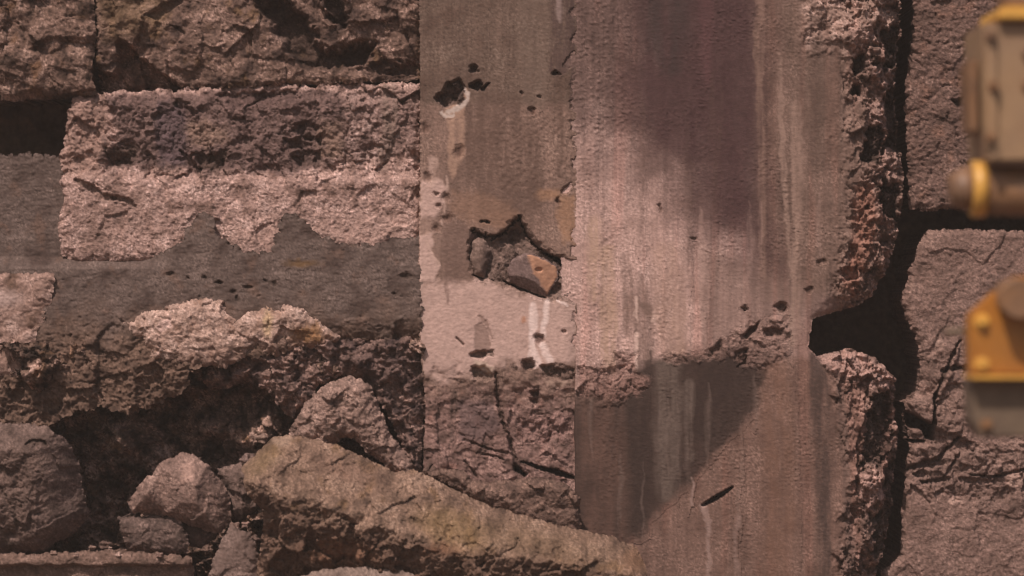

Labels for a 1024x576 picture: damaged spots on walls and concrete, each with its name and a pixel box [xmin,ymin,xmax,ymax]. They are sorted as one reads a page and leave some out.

spalling [550,31,576,169]
spalling [846,23,903,230]
peeling [395,170,655,448]
water stain [526,0,874,576]
spalling [657,301,794,373]
crack [463,371,575,481]
crack [903,339,968,485]